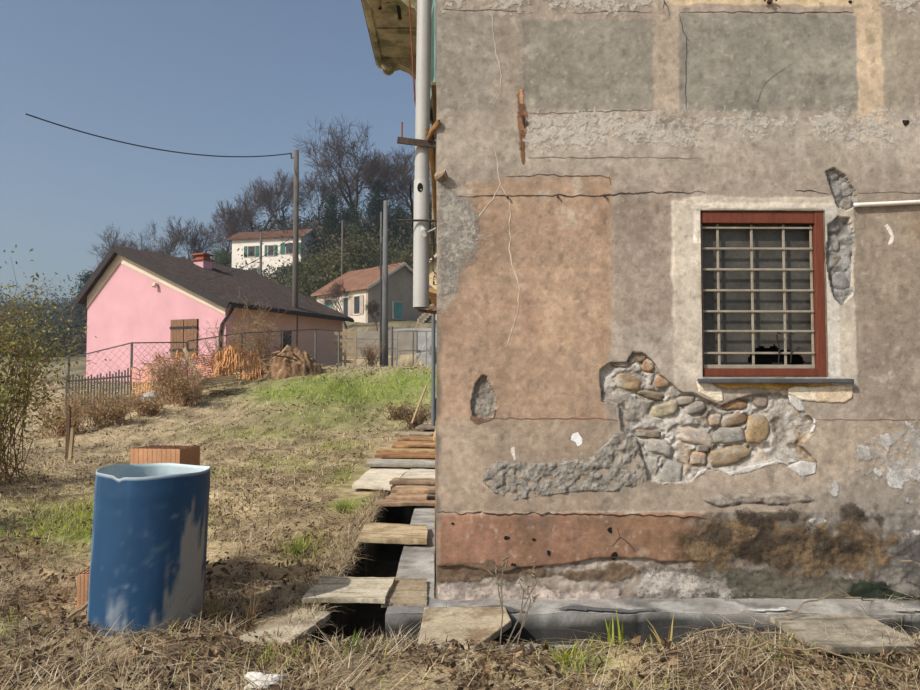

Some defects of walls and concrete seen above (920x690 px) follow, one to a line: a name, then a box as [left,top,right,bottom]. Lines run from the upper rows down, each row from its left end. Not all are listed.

corrosion [516,89,528,164]
crack [459,150,705,350]
flaking render [827,220,850,300]
spalling [470,374,497,419]
flaking render [611,353,817,483]
peeling [854,417,920,536]
leakage [437,502,920,611]